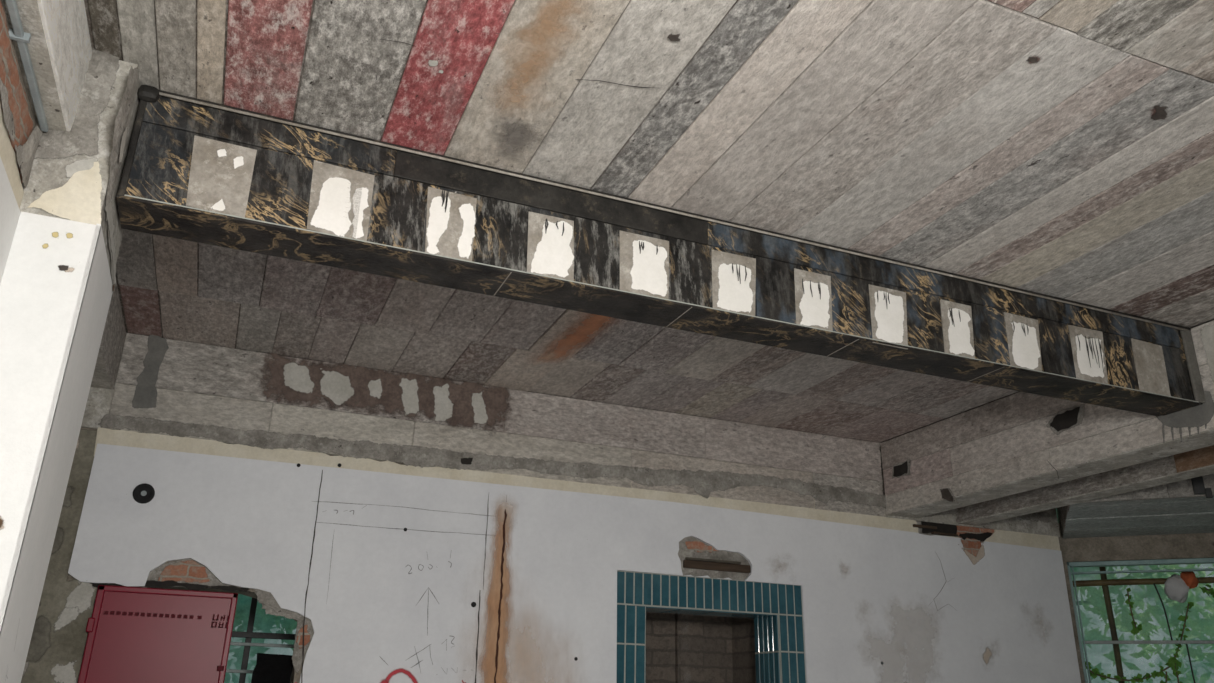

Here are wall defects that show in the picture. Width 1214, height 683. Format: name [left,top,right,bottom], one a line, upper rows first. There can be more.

flaking render [0,1,139,293]
spalling [144,558,314,673]
rust [481,505,536,683]
spalling [678,537,750,580]
spalling [916,521,994,565]